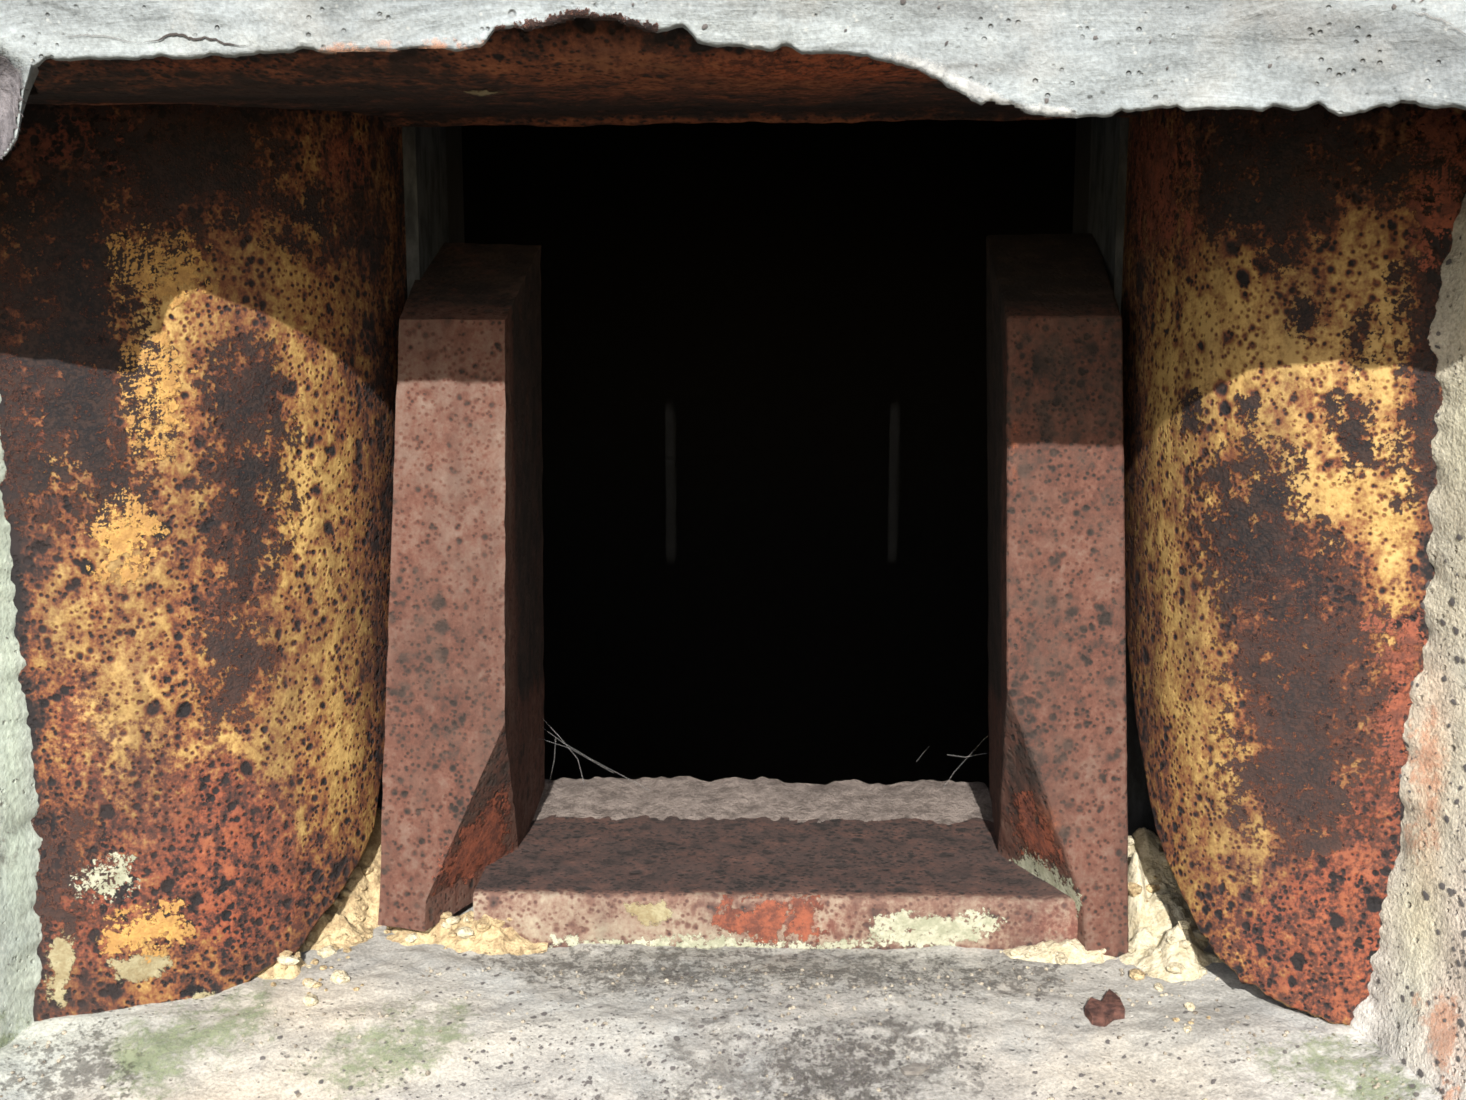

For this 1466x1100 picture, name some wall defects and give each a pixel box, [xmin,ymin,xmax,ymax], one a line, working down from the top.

spalling [494,7,672,32]
spalling [0,54,27,160]
spalling [885,52,1076,117]
rust [242,166,378,267]
rust [0,148,318,742]
rust [1172,103,1466,868]
rust [31,797,123,943]
rust [430,783,513,896]
rust [711,892,829,944]